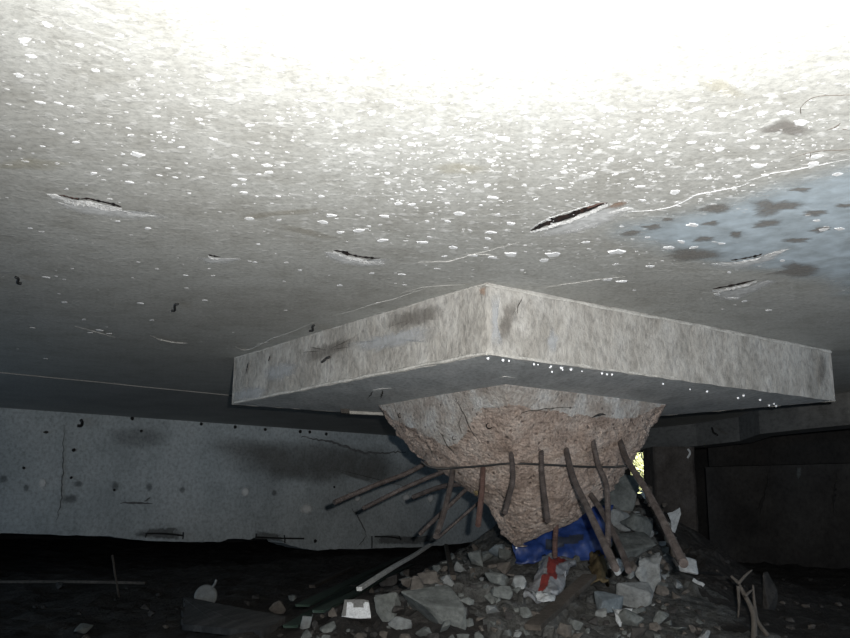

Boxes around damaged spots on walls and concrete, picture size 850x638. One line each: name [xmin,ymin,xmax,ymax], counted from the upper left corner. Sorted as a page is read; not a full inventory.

spalling [47,194,155,222]
peeling [530,154,850,277]
spalling [325,250,384,274]
spalling [712,279,773,302]
crack [43,431,65,520]
spalling [371,469,456,548]
spalling [503,451,516,515]
spalling [538,450,559,558]
spalling [564,439,632,574]
spalling [618,439,689,568]